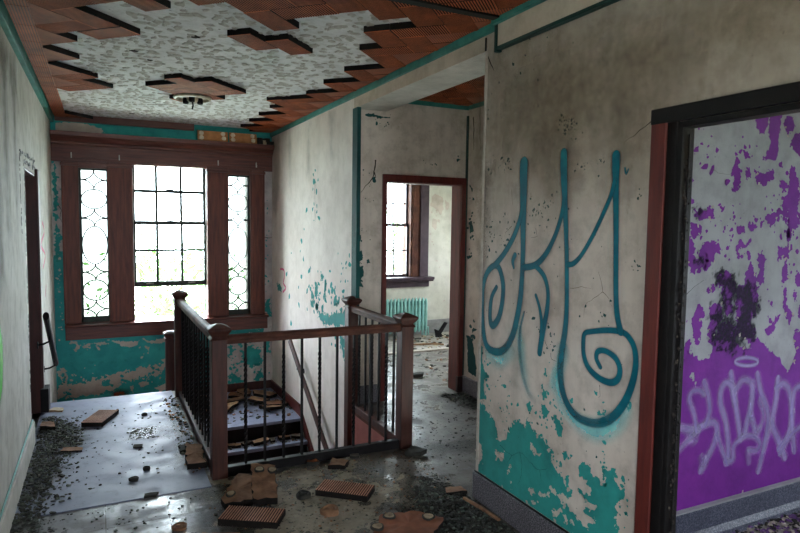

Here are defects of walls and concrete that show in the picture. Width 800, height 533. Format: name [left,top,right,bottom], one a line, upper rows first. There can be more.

peeling [55,122,103,133]
peeling [57,307,166,400]
peeling [227,328,288,412]
peeling [265,229,371,359]
leakage [709,266,761,356]
peeling [676,115,800,511]
peeling [466,312,629,533]